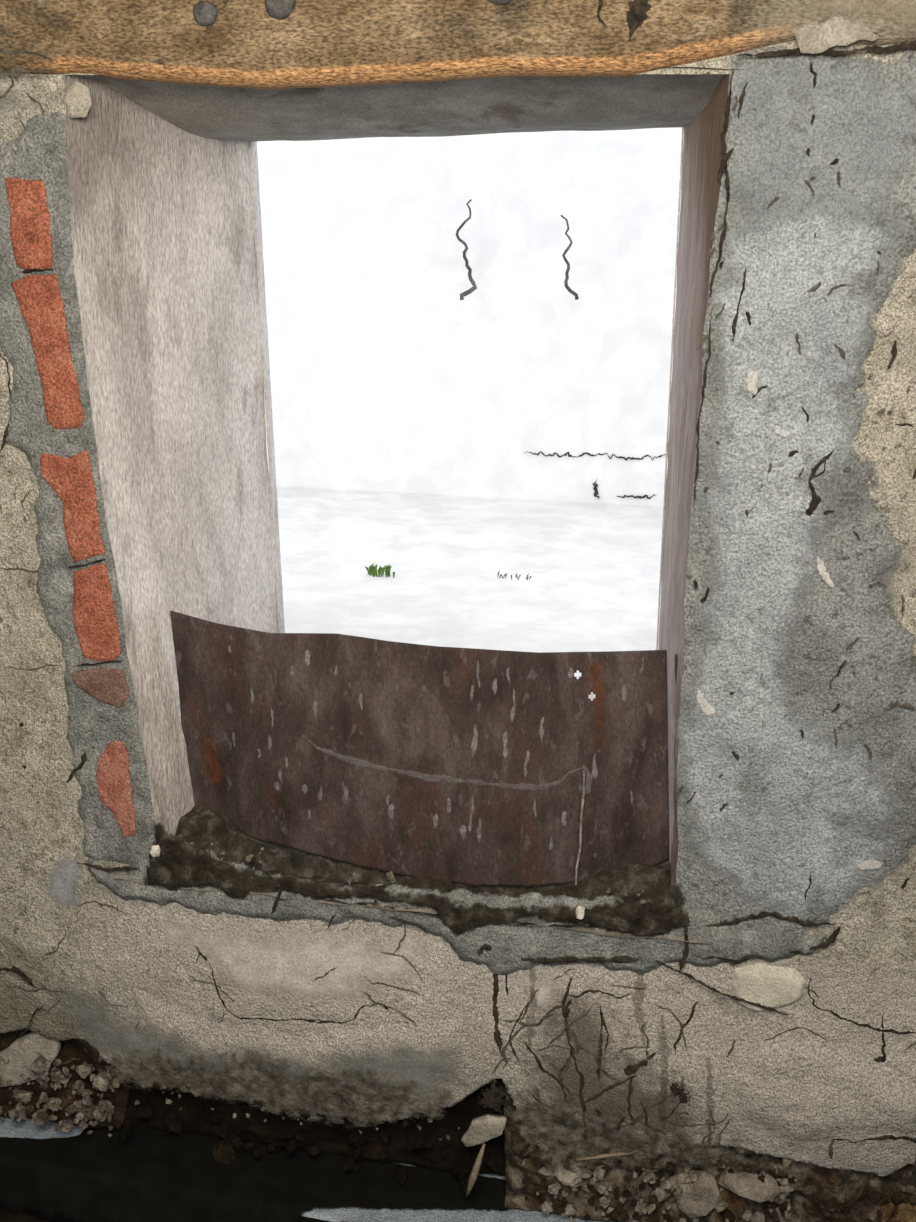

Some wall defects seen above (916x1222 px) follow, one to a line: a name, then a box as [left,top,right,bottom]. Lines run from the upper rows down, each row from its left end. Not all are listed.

flaking render [0,82,156,864]
crack [79,901,124,913]
crack [190,925,424,1027]
crack [491,969,715,1171]
water stain [524,976,687,1135]
crack [694,874,916,1062]
crack [828,1135,916,1188]